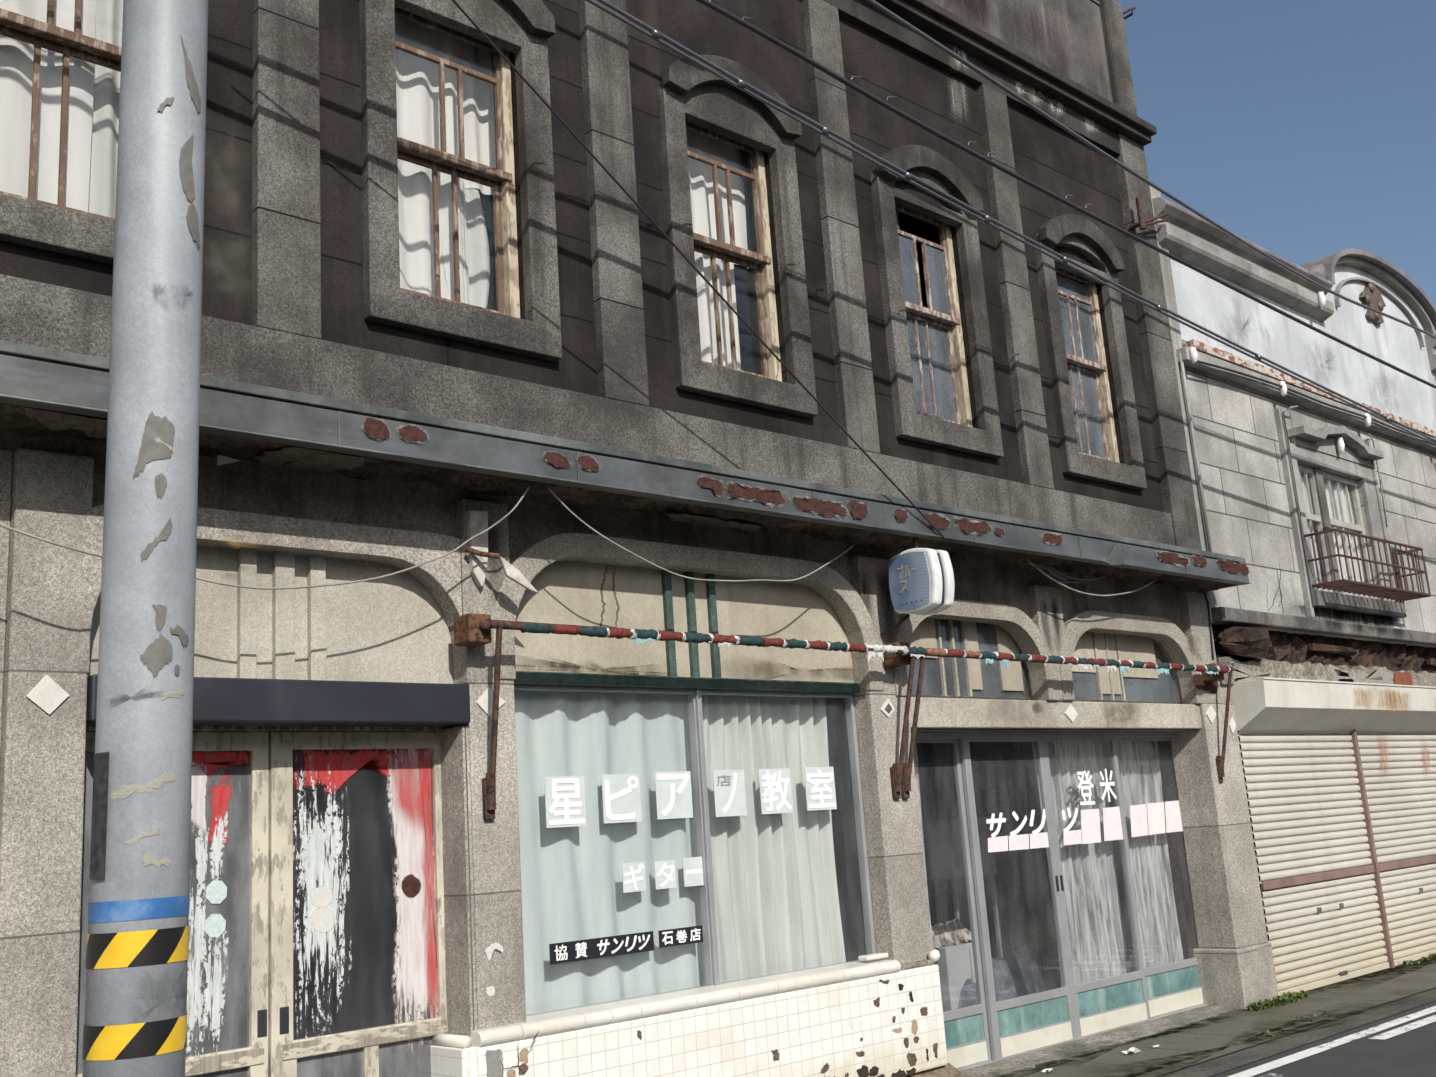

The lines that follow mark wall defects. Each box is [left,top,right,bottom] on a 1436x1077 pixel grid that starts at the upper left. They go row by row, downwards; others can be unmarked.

peeling [179,135,200,247]
peeling [133,411,175,499]
rust [363,417,428,443]
rust [544,451,599,471]
rust [698,476,868,519]
rust [926,513,1004,536]
rust [1157,551,1250,575]
crack [600,565,620,628]
peeling [187,751,251,1055]
peeling [293,749,438,1038]
spalling [486,1031,539,1077]
spalling [821,979,938,1077]